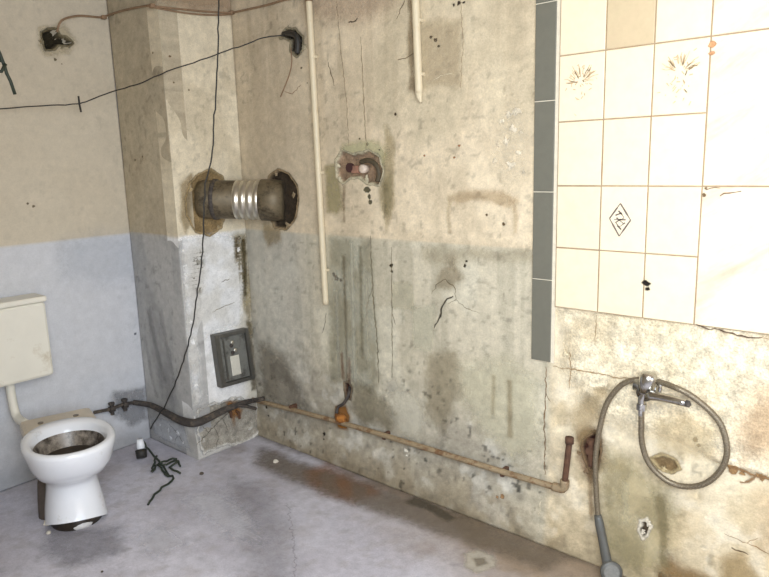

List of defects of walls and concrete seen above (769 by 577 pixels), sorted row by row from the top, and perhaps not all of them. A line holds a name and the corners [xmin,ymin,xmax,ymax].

crack [433,279,476,328]
crack [696,324,767,339]
crack [728,466,769,483]